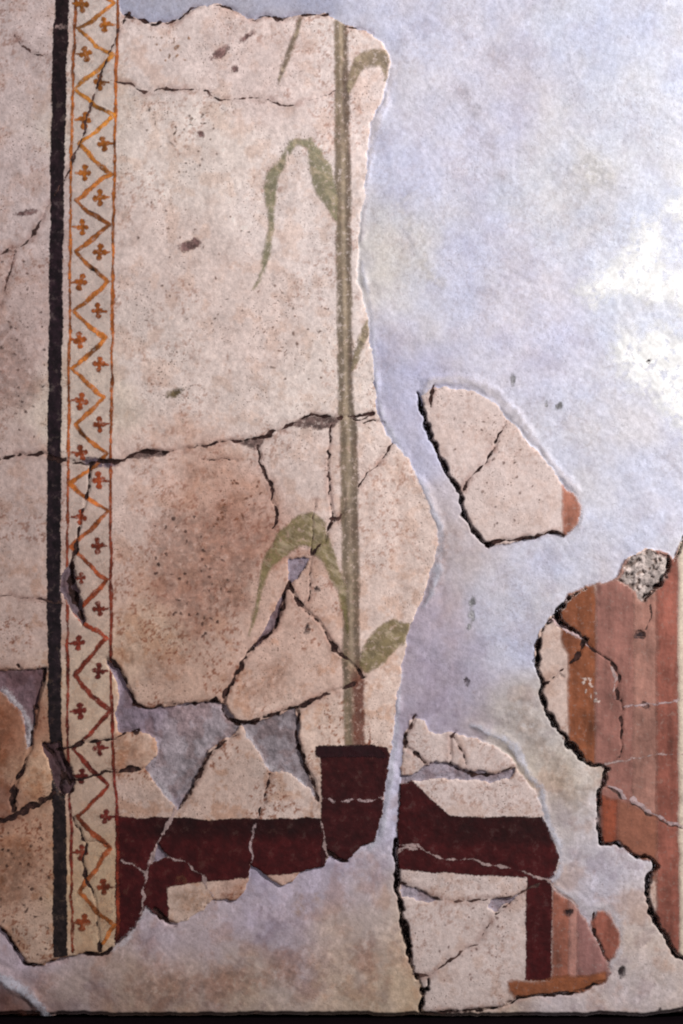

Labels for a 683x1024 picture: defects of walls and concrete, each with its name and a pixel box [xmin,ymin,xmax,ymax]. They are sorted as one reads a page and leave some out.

crack [54,5,357,196]
crack [485,530,565,548]
spalling [617,549,668,602]
crack [0,411,376,895]
crack [543,636,624,758]
spalling [107,661,315,810]
spalling [401,761,515,783]
crack [403,714,515,777]
crack [84,921,113,956]
spalling [400,884,436,903]
crack [398,881,540,978]
spalling [488,894,519,927]